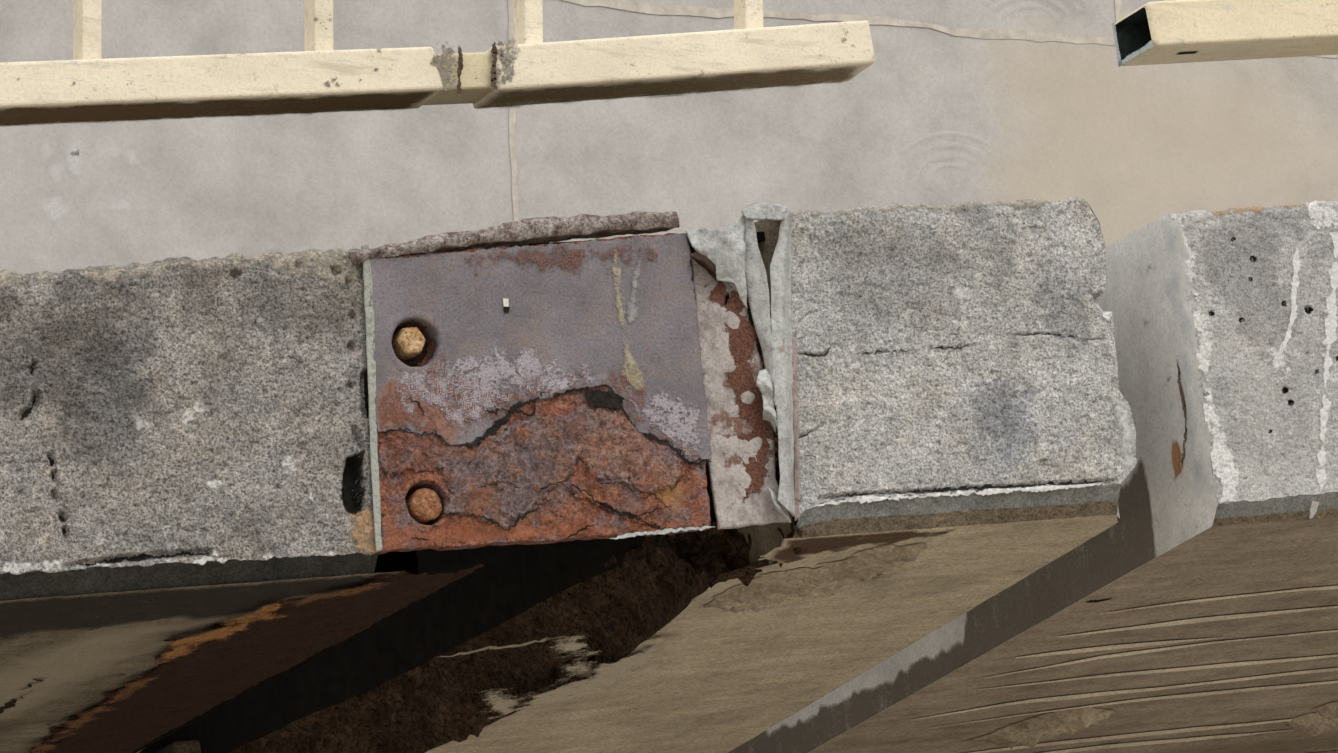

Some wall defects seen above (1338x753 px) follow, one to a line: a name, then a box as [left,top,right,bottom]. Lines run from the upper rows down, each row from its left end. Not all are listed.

water stain [791,0,1338,519]
spalling [172,233,782,753]
rust [349,355,709,554]
crack [381,385,712,541]
rust [706,281,778,502]
spalling [777,516,807,555]
water stain [728,365,1159,753]
rust [1171,441,1184,478]
water stain [1127,729,1338,753]